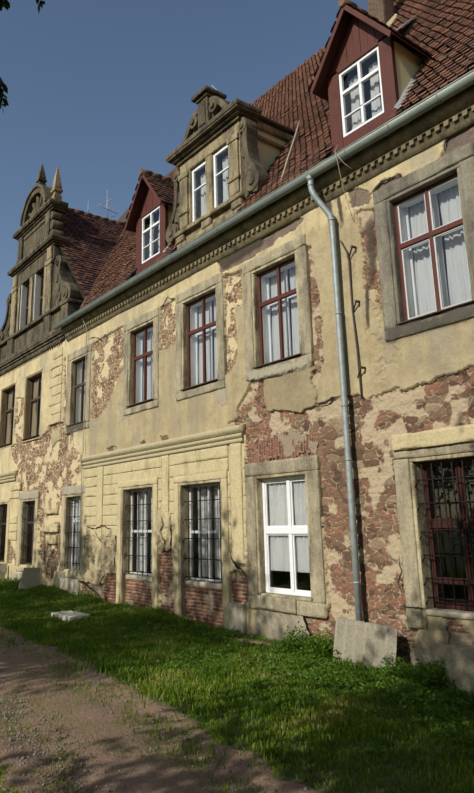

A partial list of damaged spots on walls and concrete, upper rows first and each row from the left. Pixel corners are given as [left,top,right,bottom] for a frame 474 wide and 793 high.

flaking render [442,125,474,156]
flaking render [92,327,124,419]
flaking render [161,300,176,350]
flaking render [220,218,304,373]
flaking render [349,175,402,382]
flaking render [12,360,83,583]
flaking render [228,247,474,668]